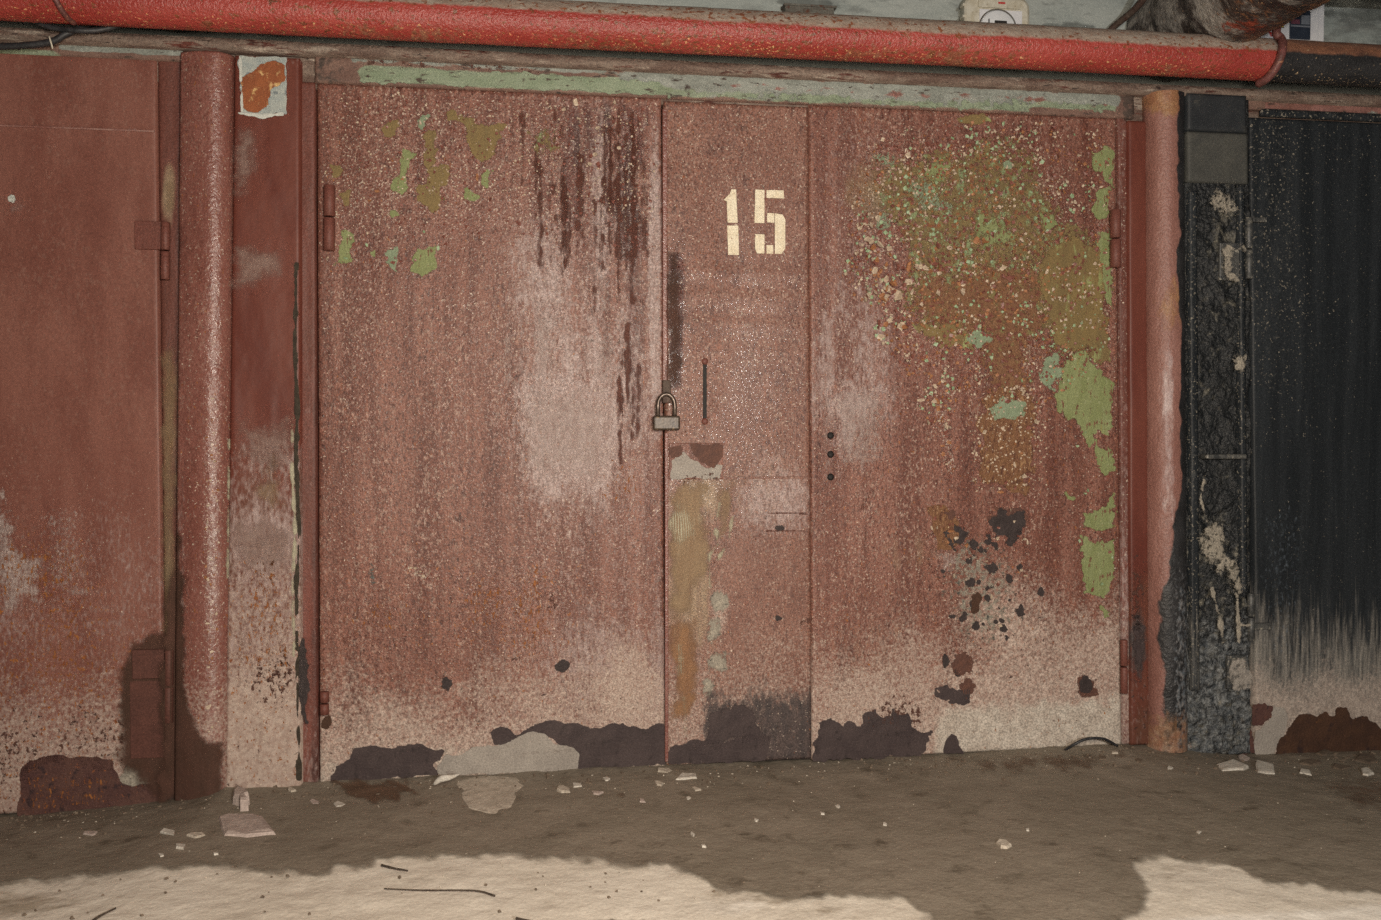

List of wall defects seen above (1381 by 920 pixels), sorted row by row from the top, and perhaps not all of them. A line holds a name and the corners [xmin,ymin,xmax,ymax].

peeling [321,60,671,300]
spalling [1210,190,1237,217]
spalling [1222,245,1246,282]
peeling [843,98,1117,618]
spalling [1233,354,1247,372]
peeling [668,443,724,484]
spalling [1229,658,1252,691]
damp [0,515,1381,920]